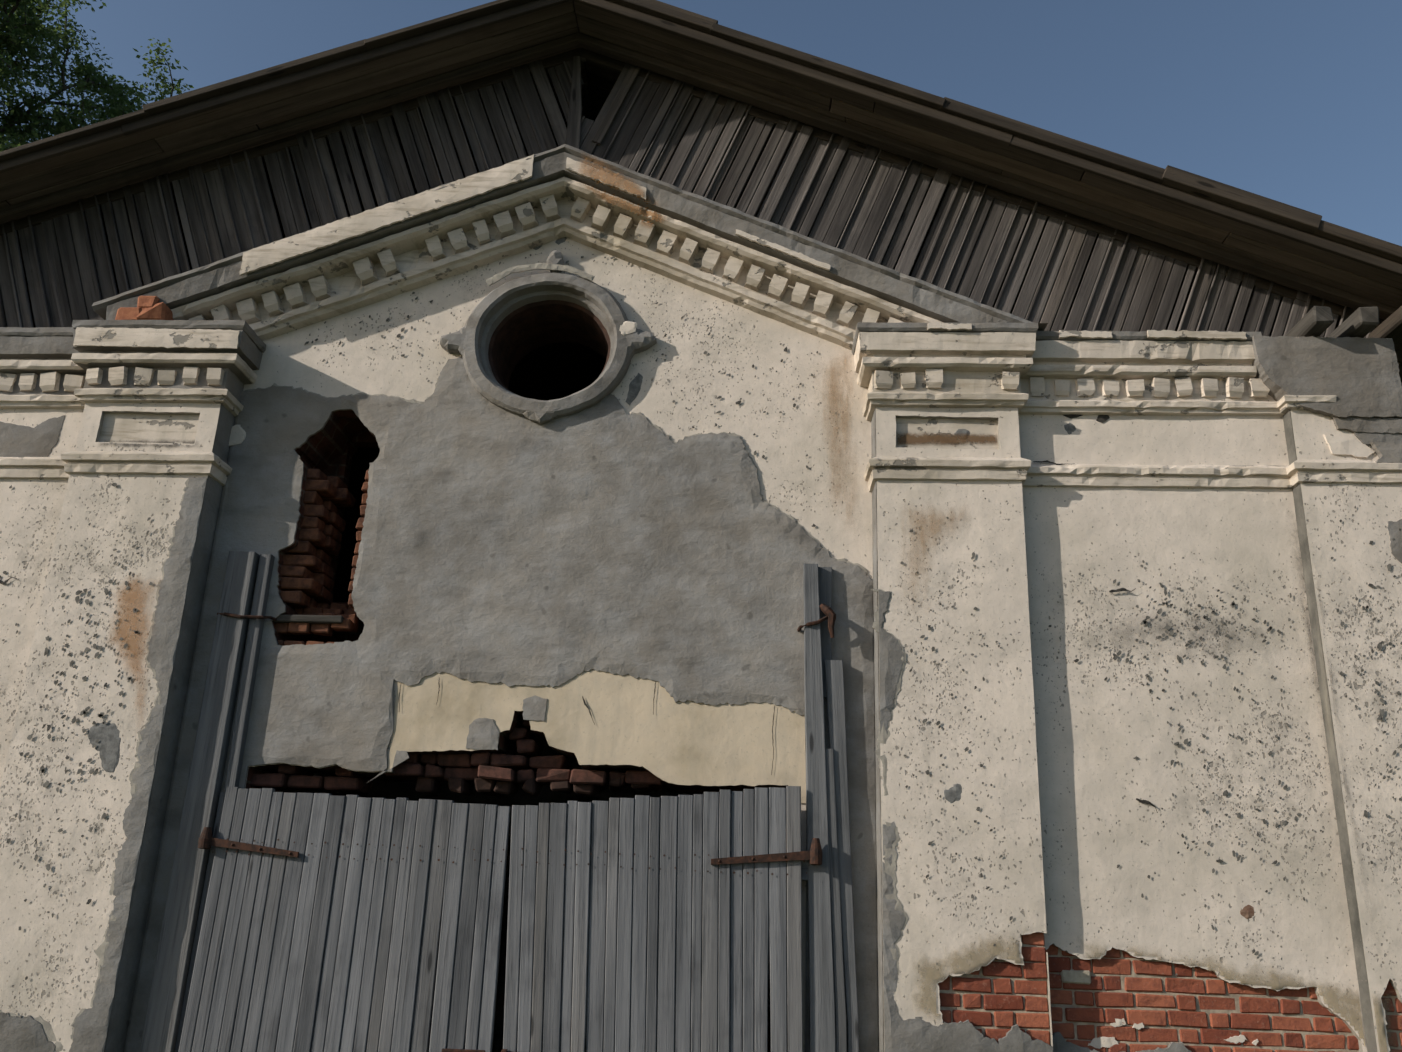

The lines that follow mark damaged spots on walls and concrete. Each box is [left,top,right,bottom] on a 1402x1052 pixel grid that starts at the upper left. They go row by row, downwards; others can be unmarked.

flaking render [672,343,813,434]
peeling [229,425,246,446]
peeling [1323,434,1375,458]
flaking render [909,590,956,672]
flaking render [1355,564,1397,620]
flaking render [1339,641,1402,733]
peeling [250,669,806,803]
flaking render [936,918,1359,1052]
flaking render [1381,981,1402,1052]